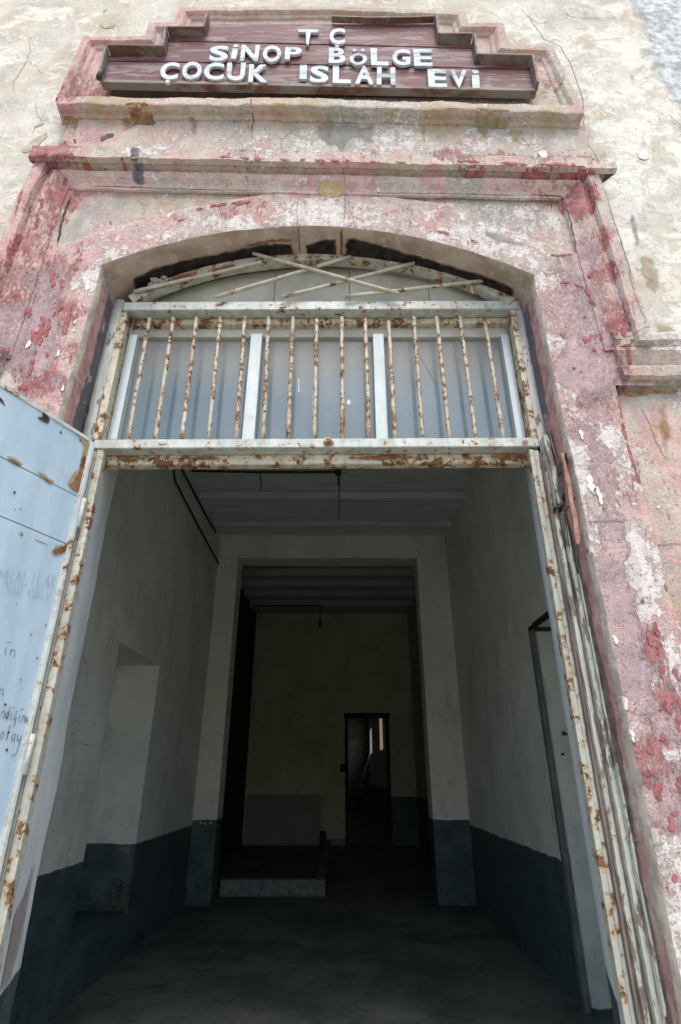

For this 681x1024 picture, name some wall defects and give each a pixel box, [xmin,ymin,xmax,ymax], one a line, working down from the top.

crack [523,11,613,157]
peeling [0,198,53,270]
peeling [560,272,597,318]
peeling [14,293,77,392]
peeling [582,328,632,365]
peeling [617,395,641,484]
flaking render [559,452,594,554]
peeling [586,473,603,505]
peeling [646,622,678,679]
peeling [628,695,681,755]
peeling [650,770,663,800]